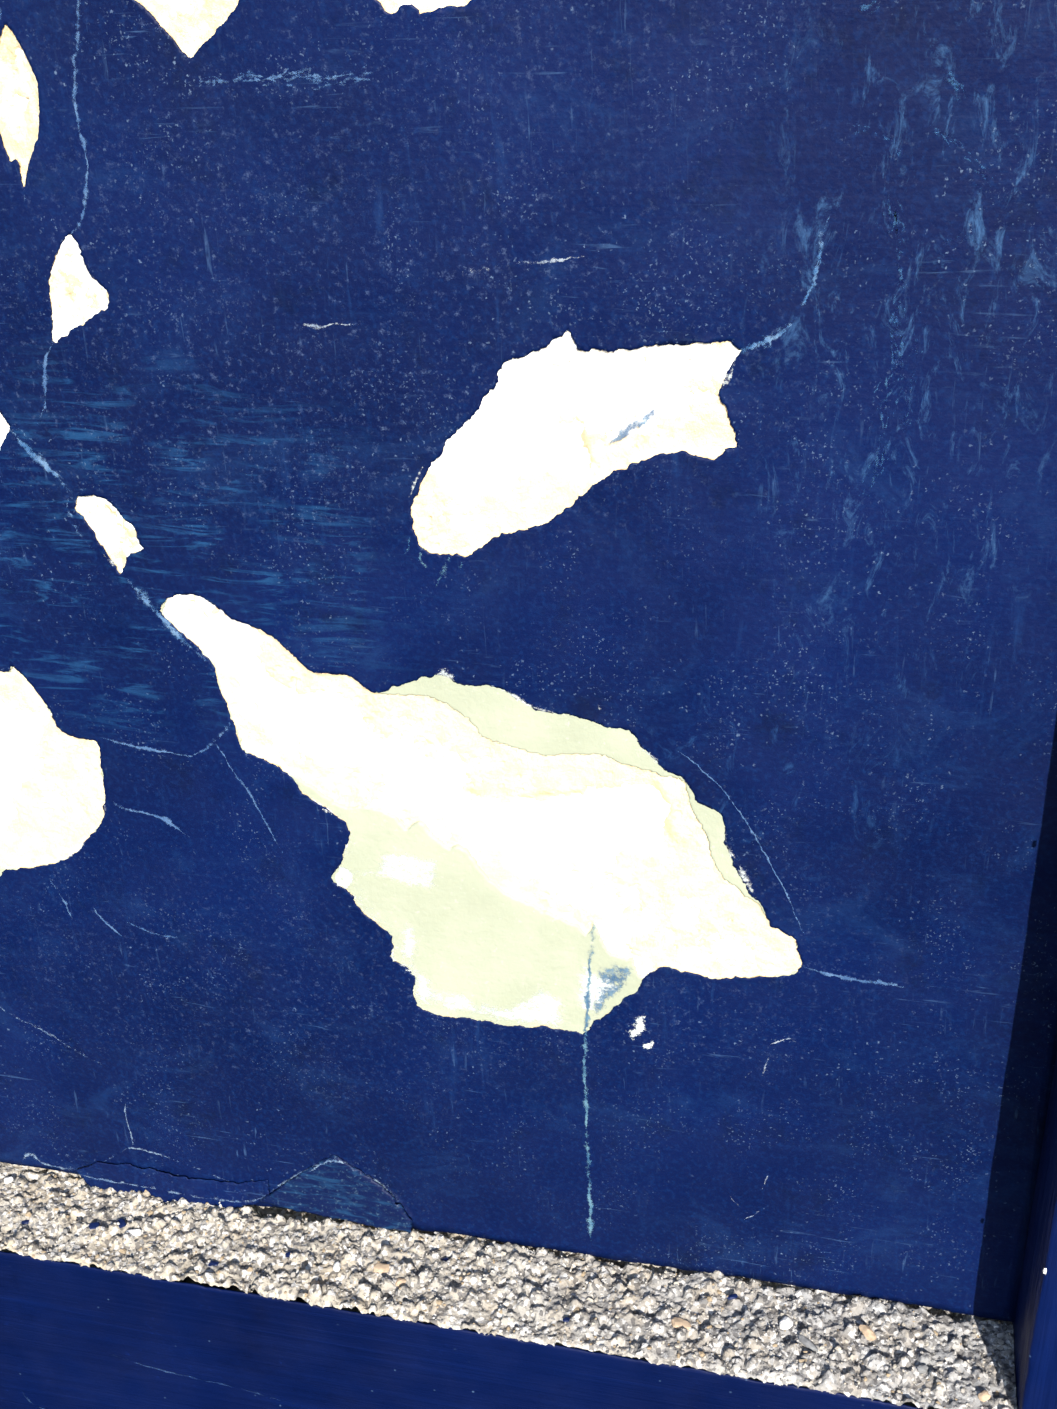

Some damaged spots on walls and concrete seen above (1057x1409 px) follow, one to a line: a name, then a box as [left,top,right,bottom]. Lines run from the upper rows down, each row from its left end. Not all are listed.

peeling [136,0,239,57]
peeling [378,0,470,14]
peeling [0,25,39,186]
peeling [49,234,109,343]
peeling [0,413,10,447]
peeling [411,331,741,556]
peeling [76,495,143,573]
peeling [0,667,106,876]
peeling [160,594,802,1034]
crack [582,929,594,1237]
peeling [630,1017,654,1049]